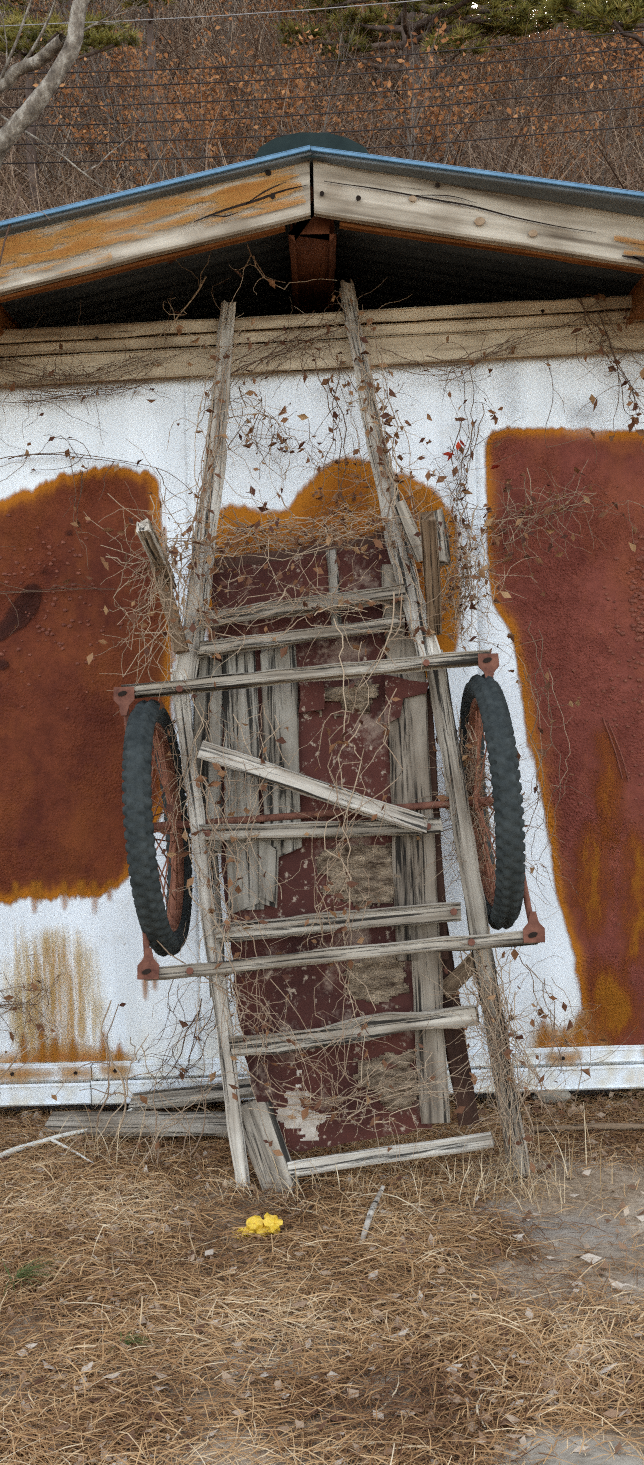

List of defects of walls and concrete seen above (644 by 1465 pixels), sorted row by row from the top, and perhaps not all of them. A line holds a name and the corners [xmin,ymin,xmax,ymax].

corrosion [215,457,383,558]
corrosion [394,473,460,653]
corrosion [0,465,174,907]
corrosion [485,426,644,1065]
corrosion [0,938,130,1082]